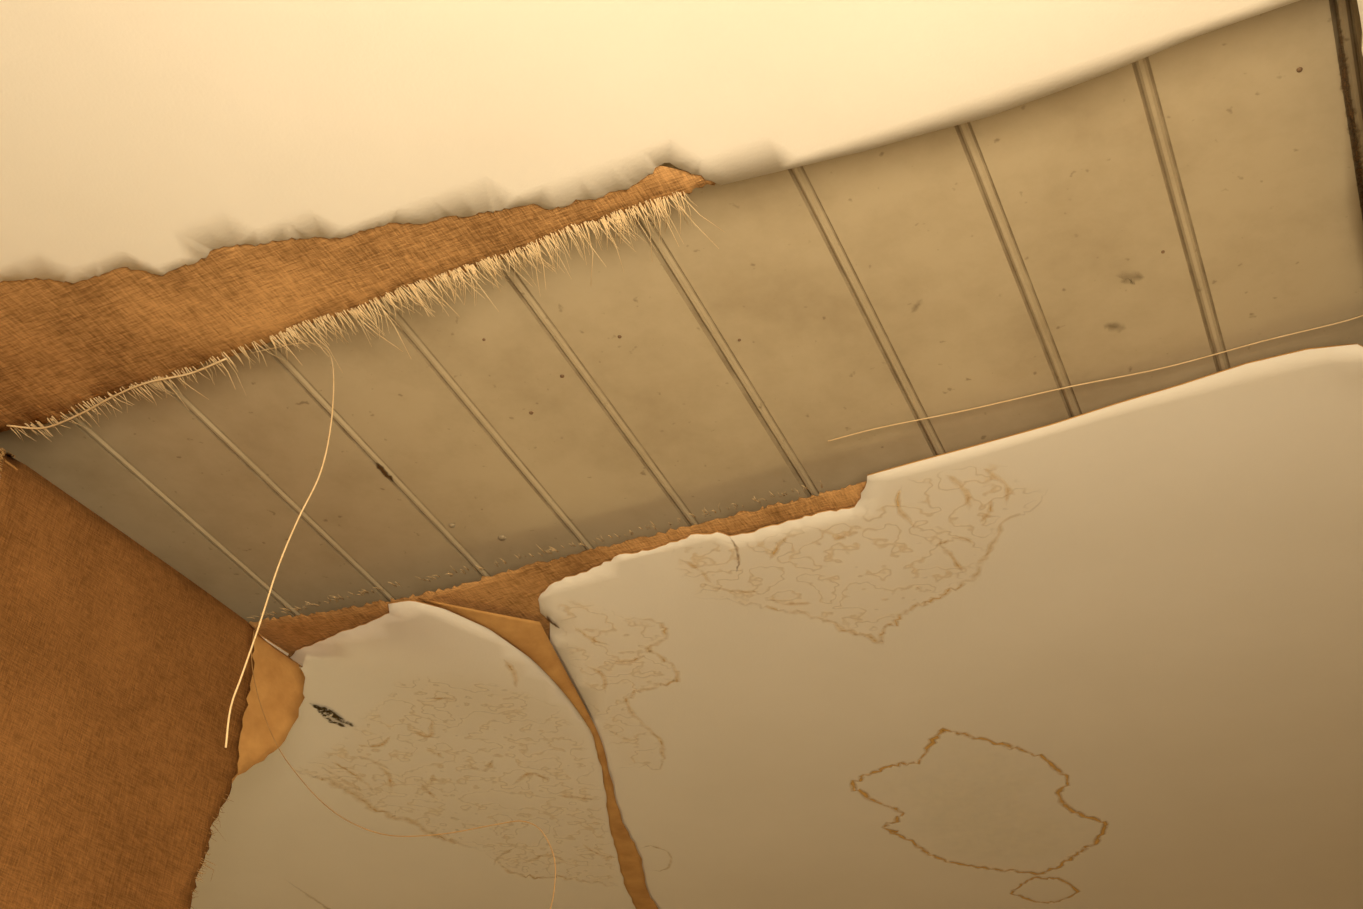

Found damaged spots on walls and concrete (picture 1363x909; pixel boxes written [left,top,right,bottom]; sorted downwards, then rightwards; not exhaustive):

peeling [0,448,305,909]
damp [313,705,353,727]
peeling [418,598,658,909]
damp [851,728,1108,903]